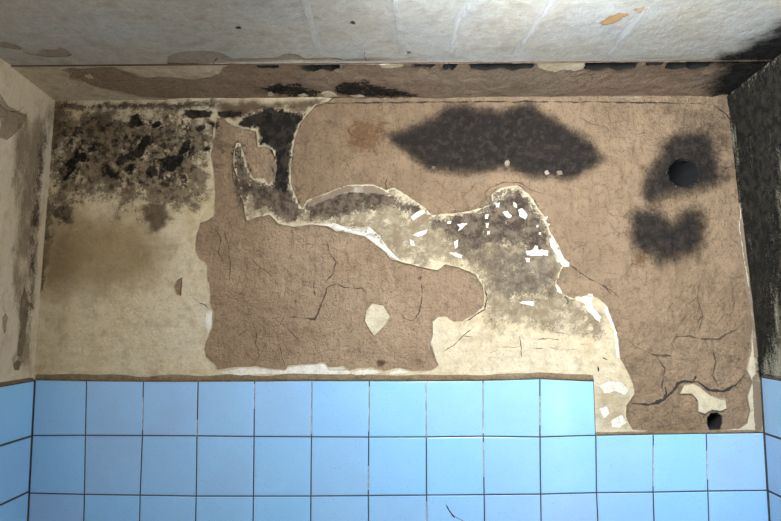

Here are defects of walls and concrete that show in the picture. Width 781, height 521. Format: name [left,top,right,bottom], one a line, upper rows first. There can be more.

peeling [0,94,27,140]
water stain [335,79,418,99]
crack [216,226,231,281]
water stain [13,83,602,365]
crack [279,241,366,365]
spalling [62,51,762,432]
crack [629,279,748,406]
water stain [706,22,781,377]